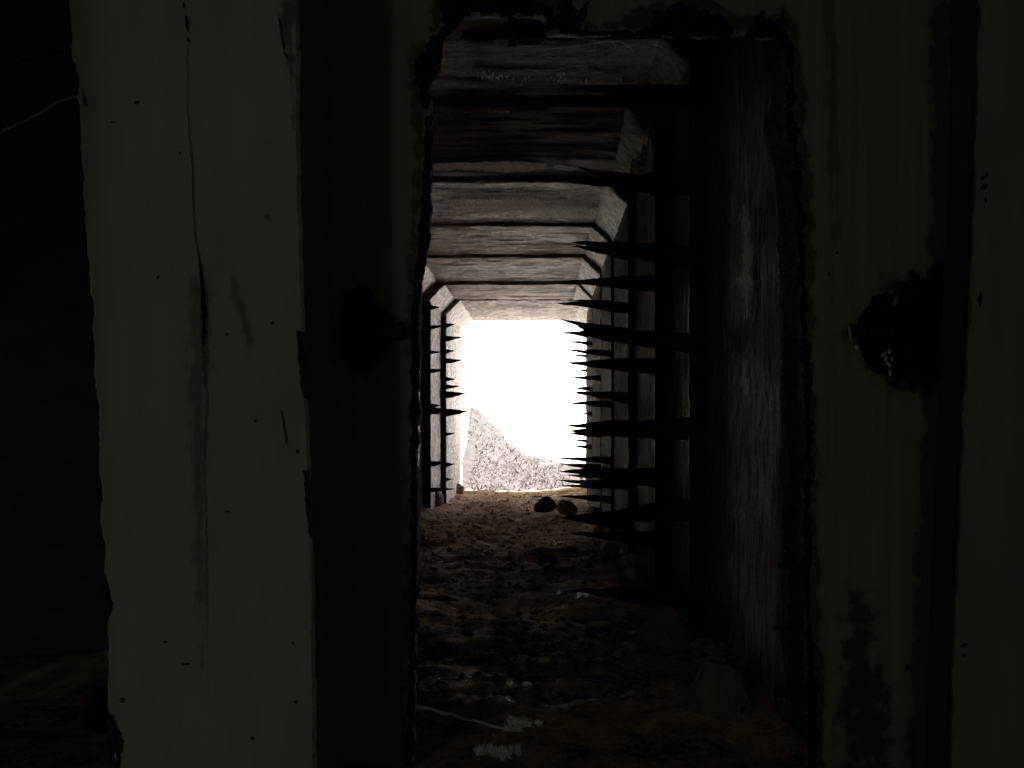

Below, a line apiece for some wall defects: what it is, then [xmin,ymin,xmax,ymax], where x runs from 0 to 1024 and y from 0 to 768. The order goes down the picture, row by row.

crack [182,2,208,665]